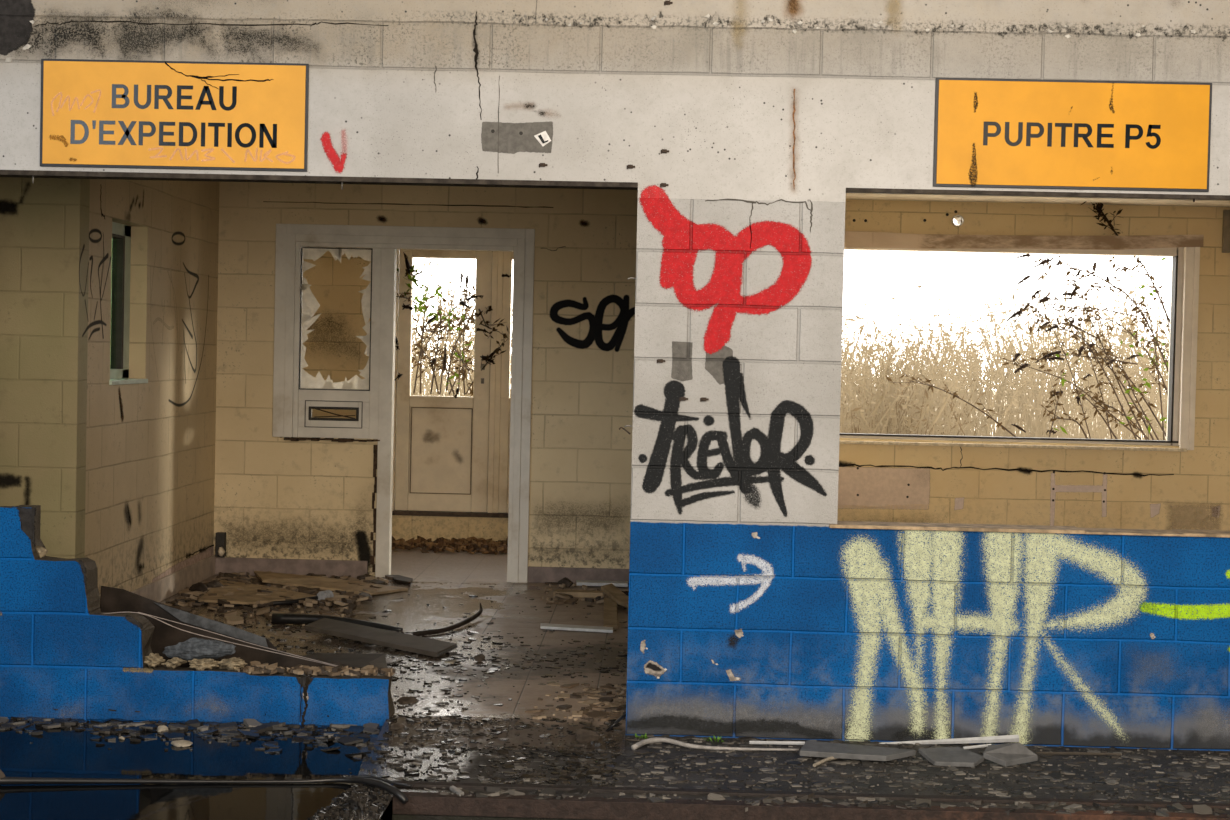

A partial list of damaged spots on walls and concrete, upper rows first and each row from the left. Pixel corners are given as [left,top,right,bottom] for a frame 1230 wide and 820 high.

peeling [0,0,47,62]
water stain [46,11,317,59]
crack [263,11,553,208]
crack [839,447,1174,478]
water stain [355,531,371,574]
spalling [640,640,667,679]
spalling [728,629,744,647]
crack [296,676,314,725]